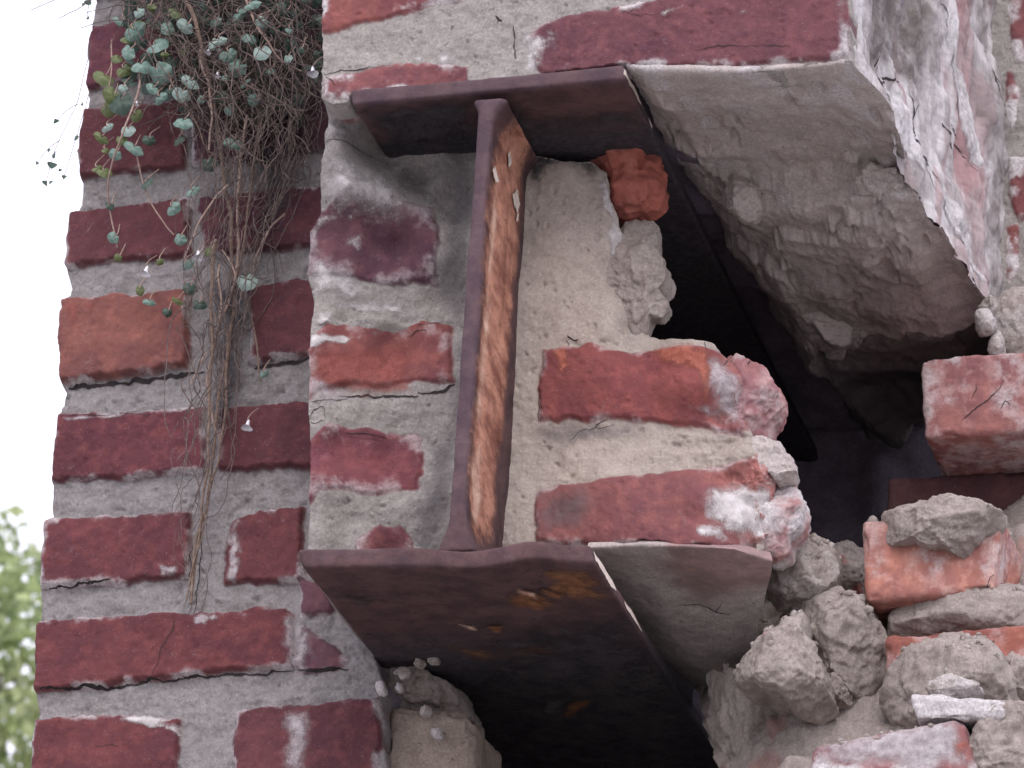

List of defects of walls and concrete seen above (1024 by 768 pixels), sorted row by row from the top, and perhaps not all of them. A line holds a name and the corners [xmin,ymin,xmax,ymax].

spalling [591,148,669,225]
flaking render [944,195,987,282]
corrosion [469,124,529,540]
crack [69,371,205,390]
crack [254,357,309,369]
crack [962,380,1010,420]
leakage [698,487,770,537]
spalling [862,353,1024,673]
crack [40,527,349,691]
corrosion [513,572,598,610]
peeling [594,552,616,590]
spalling [811,721,978,768]